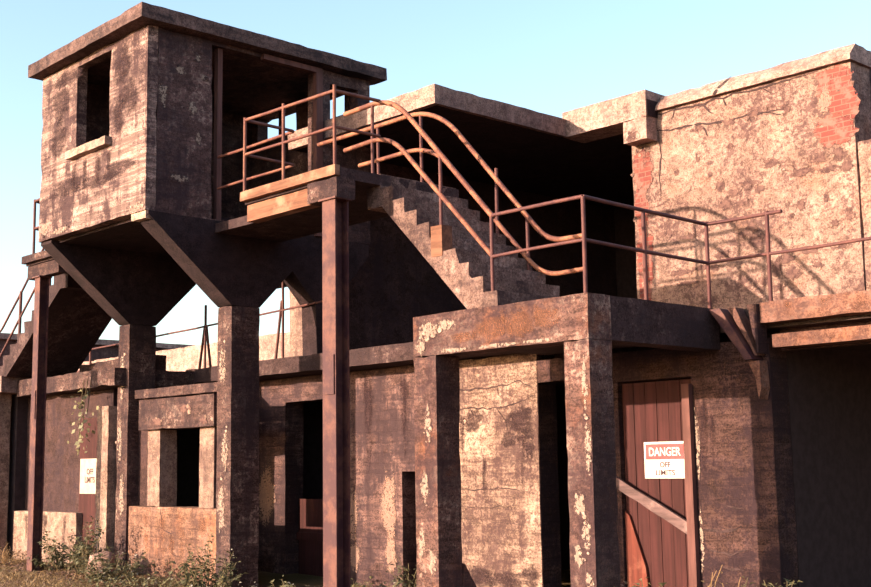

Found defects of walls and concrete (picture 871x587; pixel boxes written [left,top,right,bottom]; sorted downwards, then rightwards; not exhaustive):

leakage [51,67,82,158]
leakage [51,152,136,199]
leakage [113,46,137,132]
crack [657,74,808,197]
flaking render [708,64,861,243]
flaking render [631,149,710,300]
spalling [669,250,729,286]
peeling [581,355,593,475]
peeling [574,493,594,587]